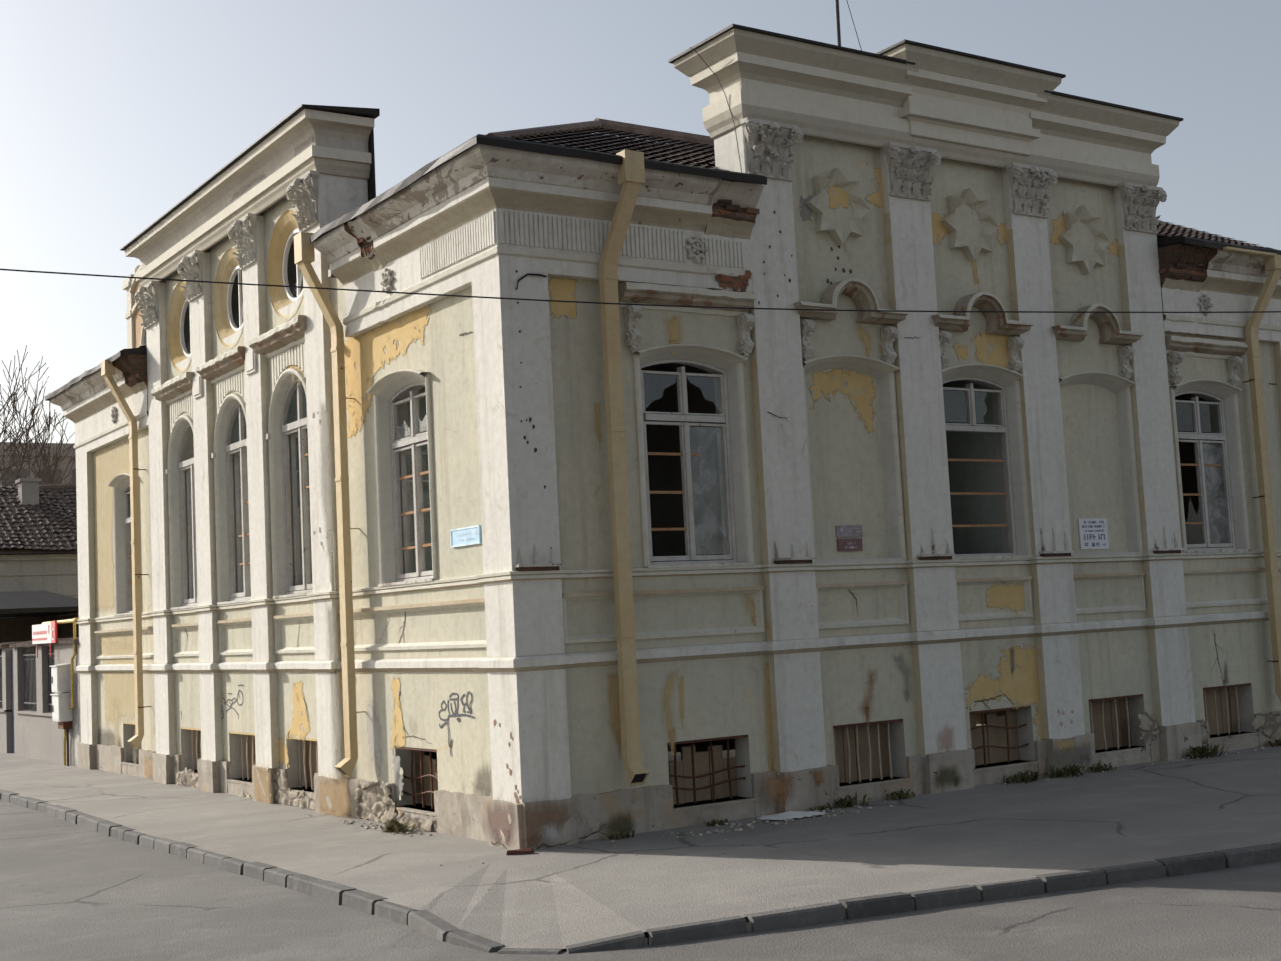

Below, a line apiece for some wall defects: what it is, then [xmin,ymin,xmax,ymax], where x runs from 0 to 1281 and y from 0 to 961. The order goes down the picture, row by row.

peeling [344,304,432,438]
peeling [809,369,877,433]
spalling [272,680,315,810]
spalling [355,677,433,831]
peeling [964,644,1043,741]